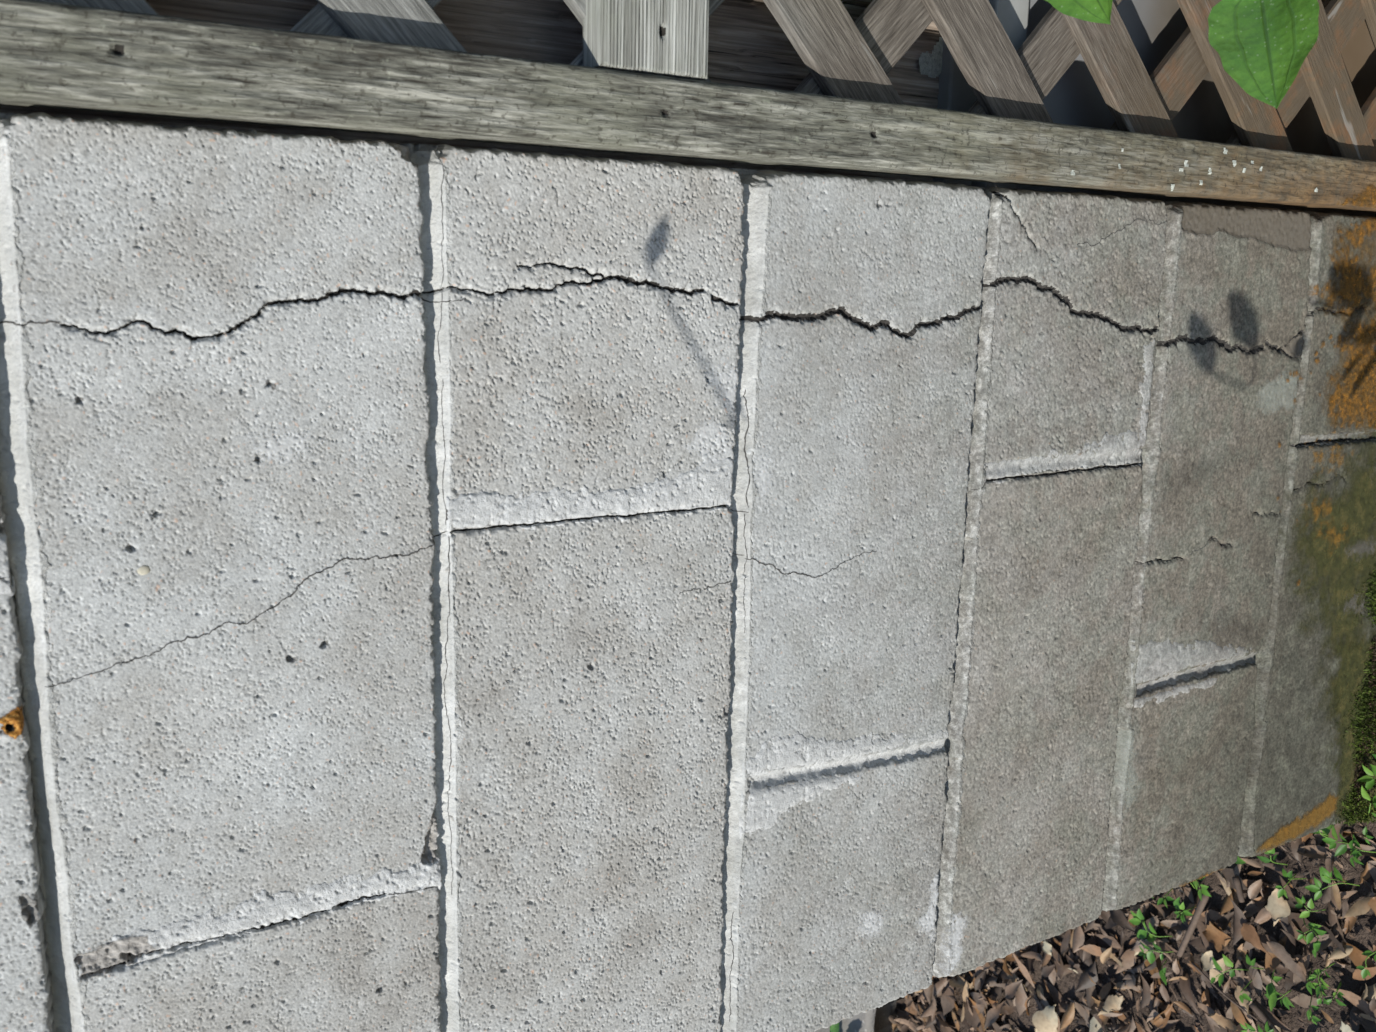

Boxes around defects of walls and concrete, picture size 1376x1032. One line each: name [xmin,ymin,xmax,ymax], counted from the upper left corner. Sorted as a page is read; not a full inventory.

crack [0,148,1374,974]
corrosion [0,705,24,739]
water stain [1258,796,1337,851]
crack [727,912,735,1022]